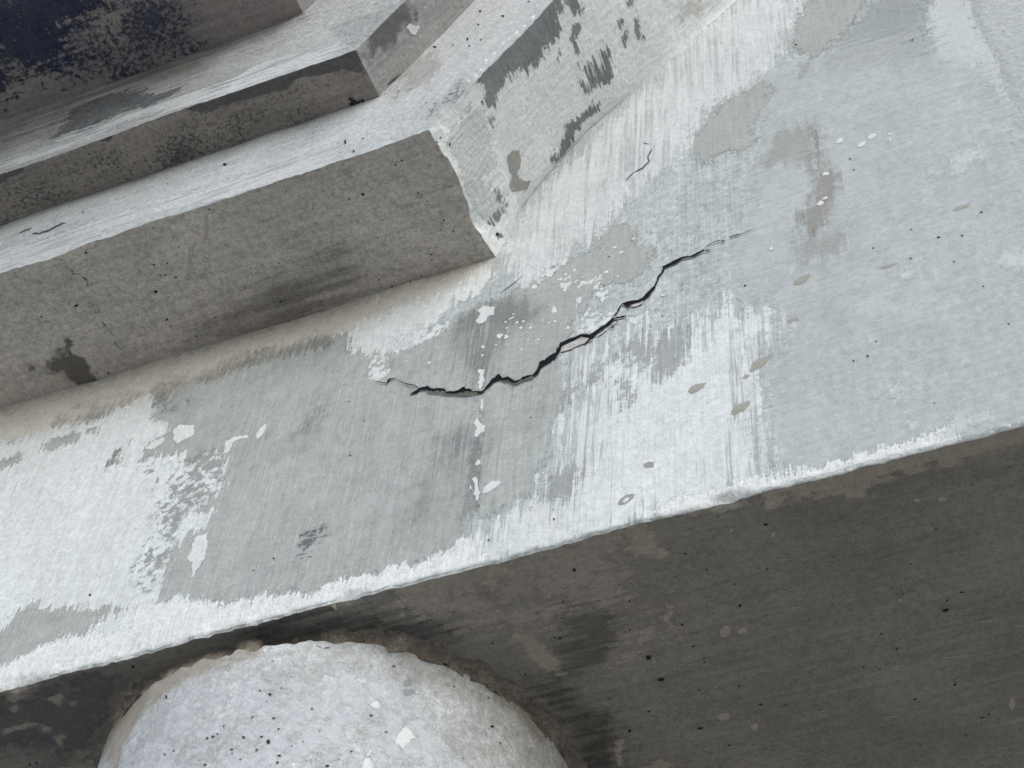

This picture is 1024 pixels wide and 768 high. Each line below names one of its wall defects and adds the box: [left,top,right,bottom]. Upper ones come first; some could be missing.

crack [376,230,750,396]